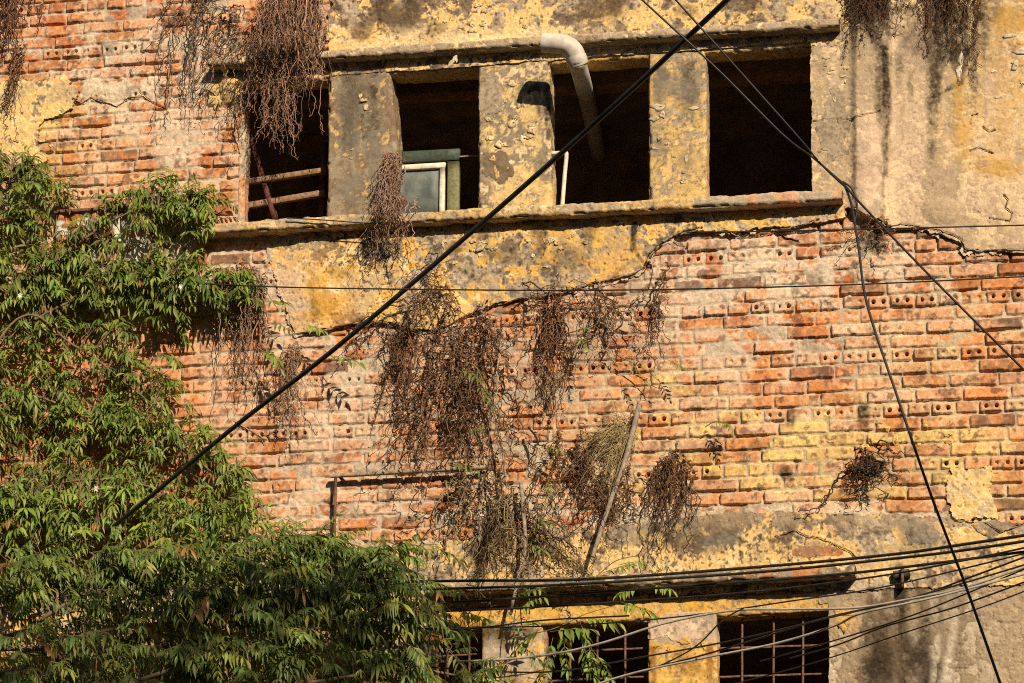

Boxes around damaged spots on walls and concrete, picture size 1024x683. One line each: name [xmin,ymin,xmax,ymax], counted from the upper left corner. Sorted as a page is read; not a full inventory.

flaking render [208,74,225,111]
peeling [478,71,536,143]
peeling [649,103,665,122]
leakage [863,0,912,160]
leakage [927,0,990,123]
flaking render [482,135,514,184]
leakage [859,578,958,683]